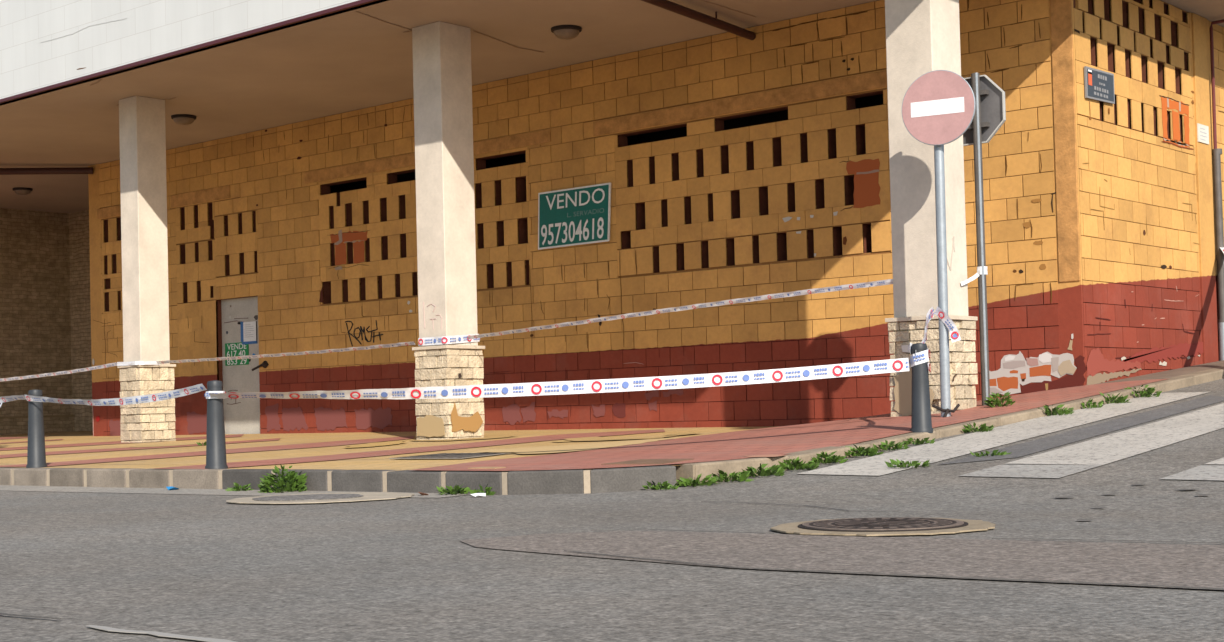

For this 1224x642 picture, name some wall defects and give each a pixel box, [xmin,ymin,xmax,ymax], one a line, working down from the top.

peeling [989,334,1077,395]